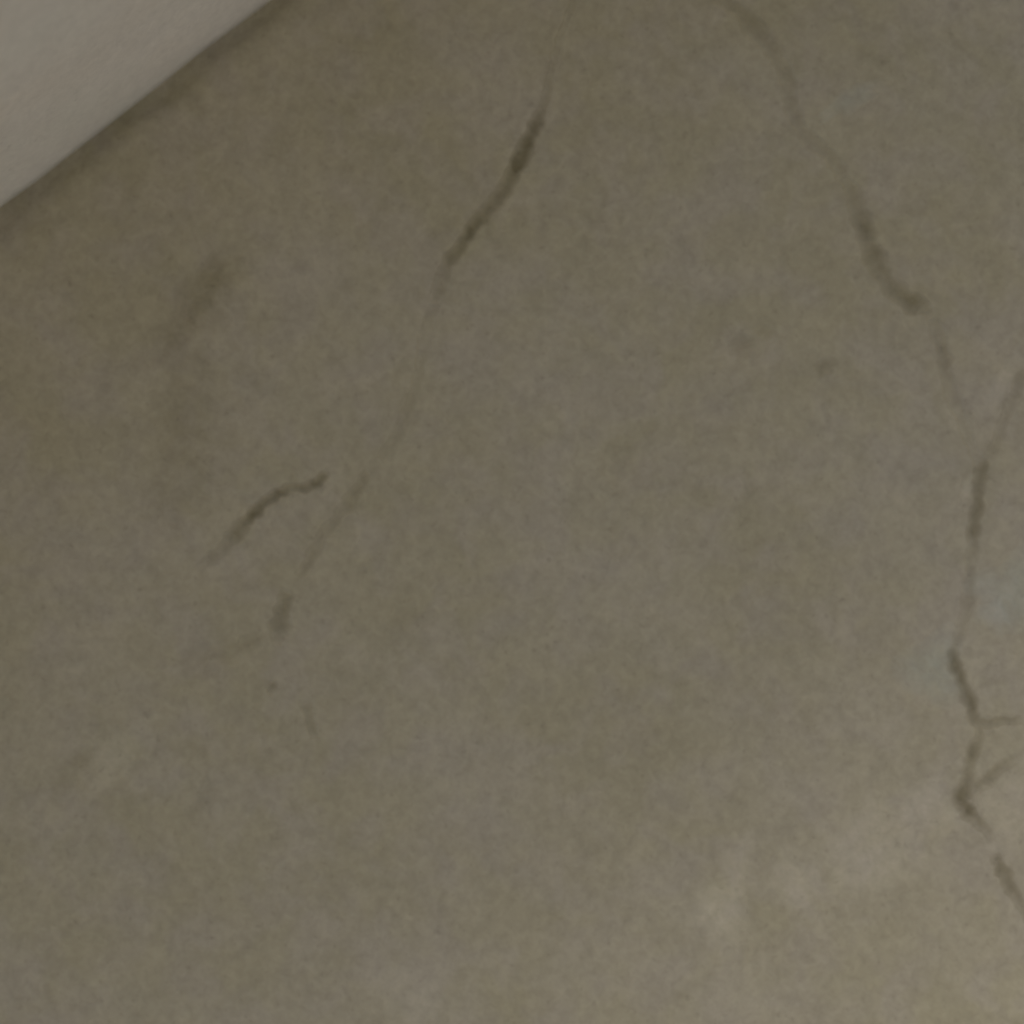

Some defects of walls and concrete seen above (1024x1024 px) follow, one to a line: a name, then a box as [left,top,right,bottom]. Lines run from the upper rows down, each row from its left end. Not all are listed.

crack [192,0,577,646]
crack [710,0,1024,923]